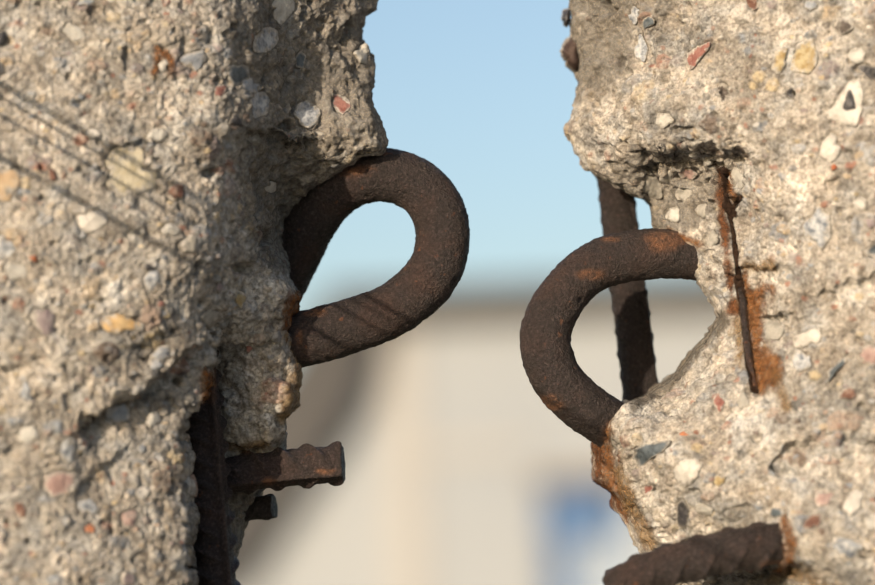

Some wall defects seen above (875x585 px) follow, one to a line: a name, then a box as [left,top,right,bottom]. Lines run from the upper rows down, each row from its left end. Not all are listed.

crack [714,161,758,393]
corrosion [715,172,789,411]
corrosion [591,425,656,550]
corrosion [767,516,825,585]